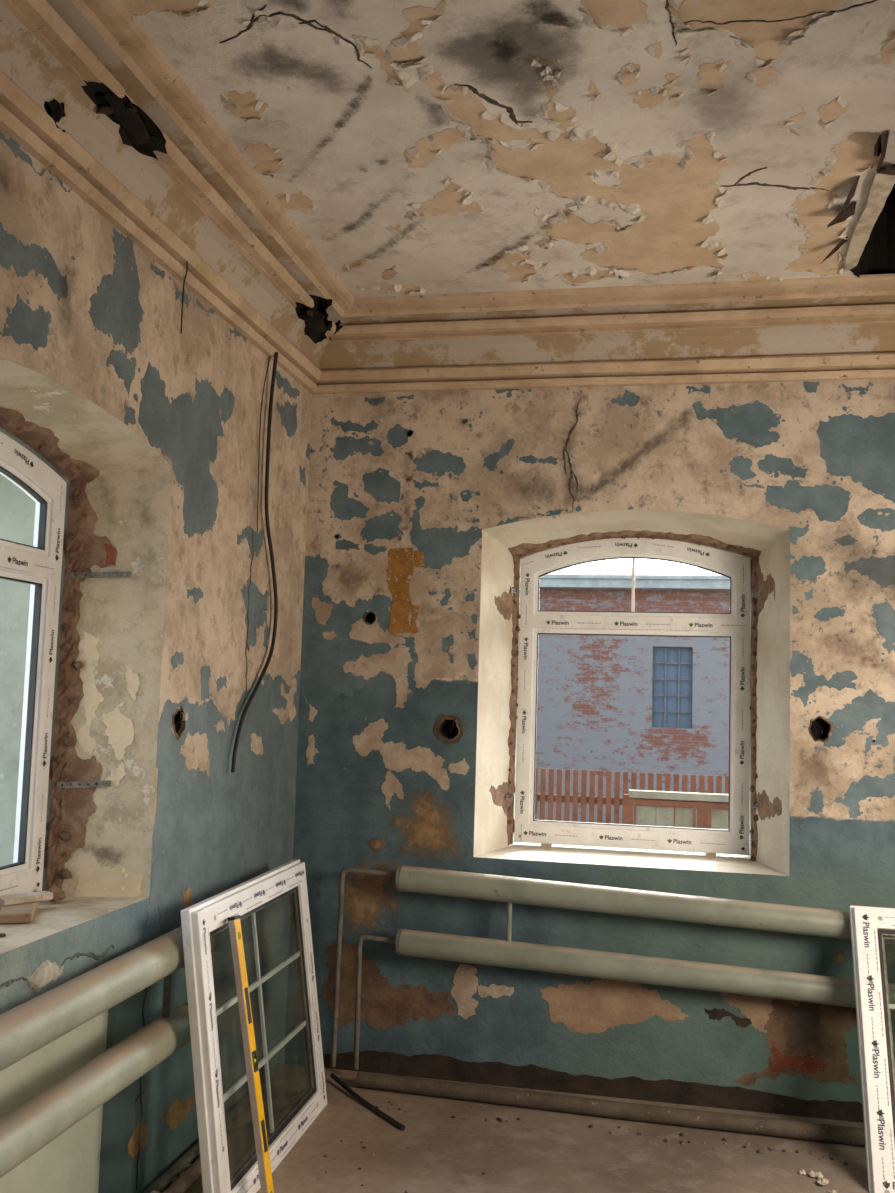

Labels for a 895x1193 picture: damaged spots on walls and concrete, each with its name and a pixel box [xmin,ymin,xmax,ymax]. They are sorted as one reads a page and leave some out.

crack [219,5,372,69]
crack [454,84,533,126]
water stain [527,3,571,27]
peeling [351,0,890,286]
crack [665,0,878,45]
peeling [88,227,236,538]
crack [563,398,581,502]
peeling [686,382,895,662]
peeling [0,395,581,936]
flaking render [489,530,782,861]
peeling [790,650,895,818]
flaking render [705,992,859,1086]